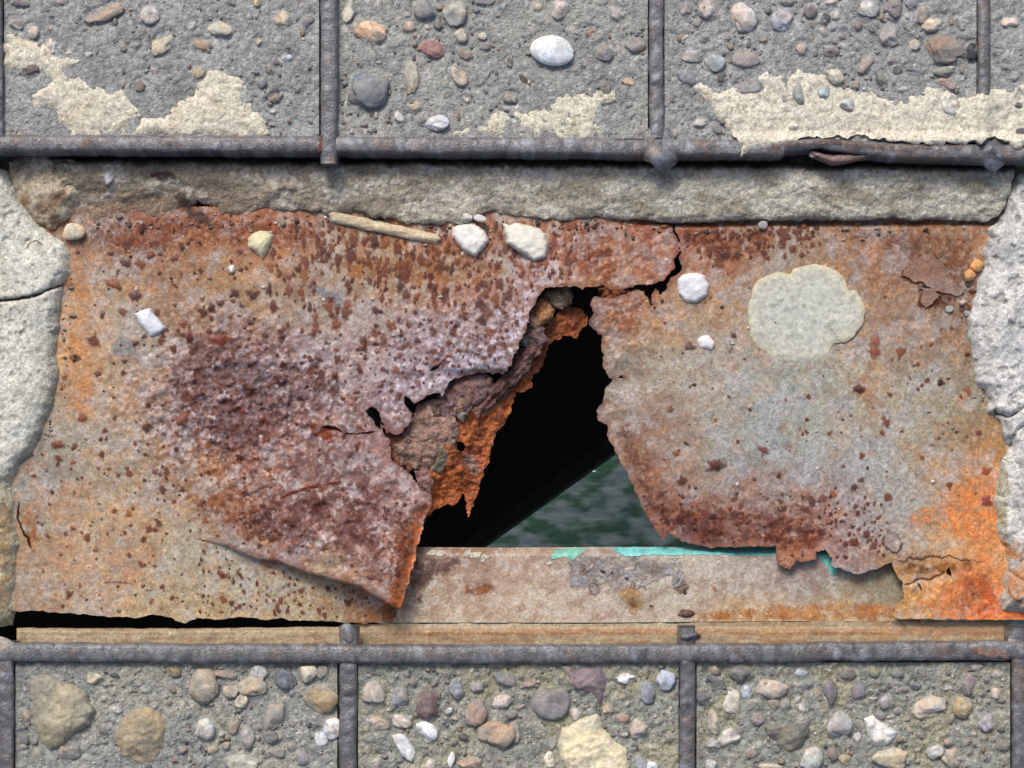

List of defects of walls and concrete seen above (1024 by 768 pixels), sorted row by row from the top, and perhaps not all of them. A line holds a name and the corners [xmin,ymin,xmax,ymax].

crack [0,285,63,302]
corrosion [684,224,821,268]
corrosion [887,234,971,313]
corrosion [869,335,879,357]
corrosion [23,216,611,619]
corrosion [853,376,893,436]
corrosion [891,347,971,413]
corrosion [628,451,902,559]
corrosion [908,468,1024,613]
corrosion [622,584,643,613]
corrosion [678,602,895,621]
crack [899,555,982,591]